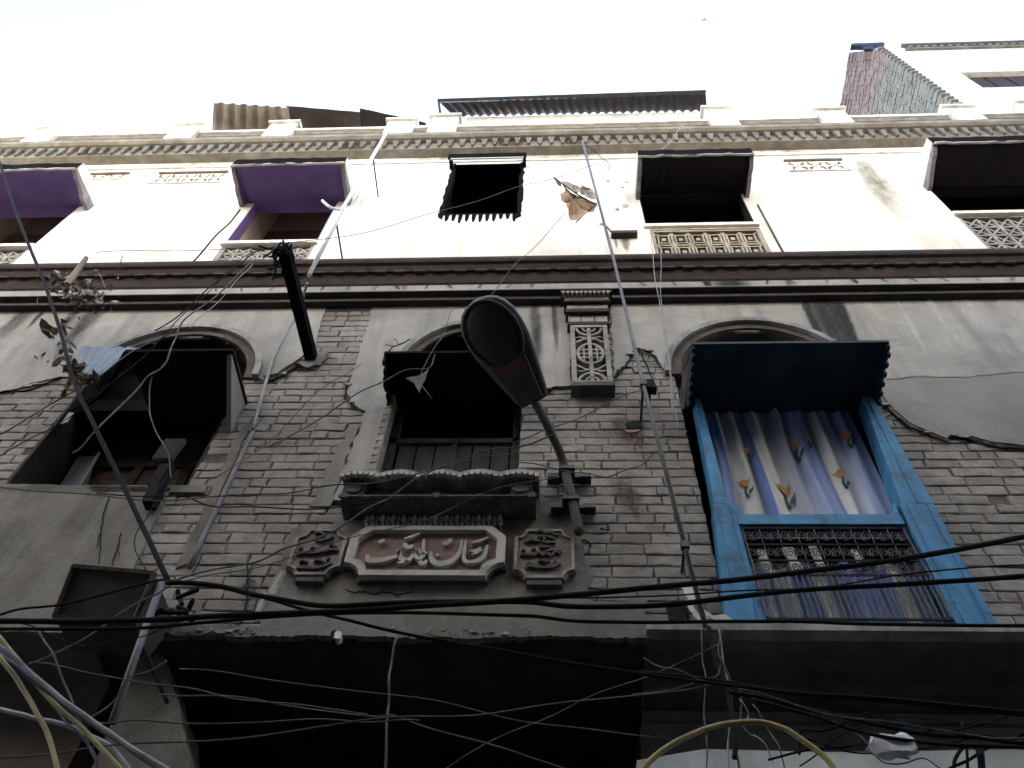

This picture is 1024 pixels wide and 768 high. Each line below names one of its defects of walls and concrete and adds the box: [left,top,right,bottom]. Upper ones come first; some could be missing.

damp [803,301,857,341]
crack [96,497,122,565]